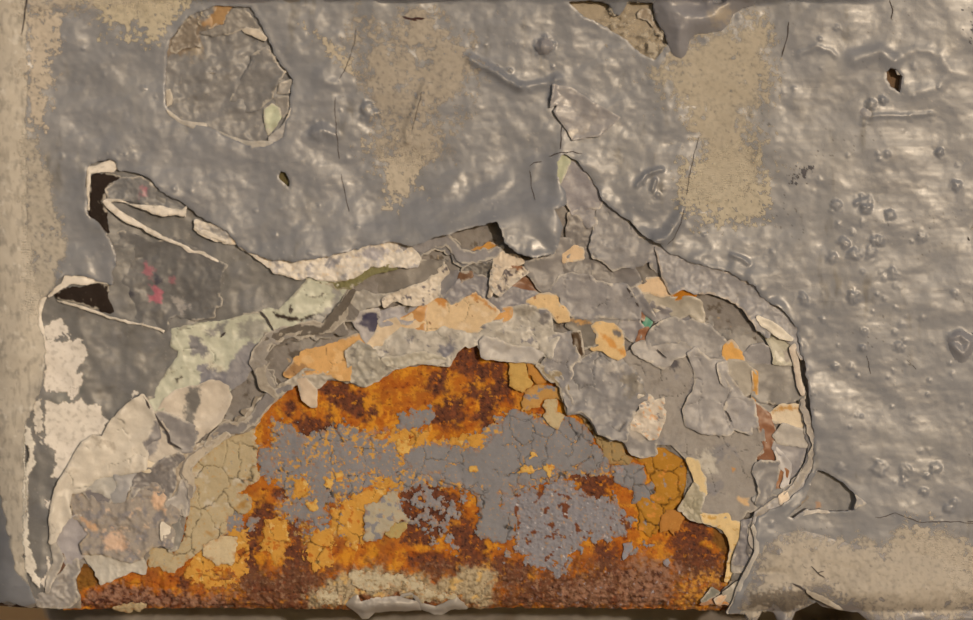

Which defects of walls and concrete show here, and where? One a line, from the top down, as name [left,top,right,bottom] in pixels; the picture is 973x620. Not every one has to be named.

peeling [550,84,620,140]
corrosion [63,346,729,613]
peeling [23,154,867,610]